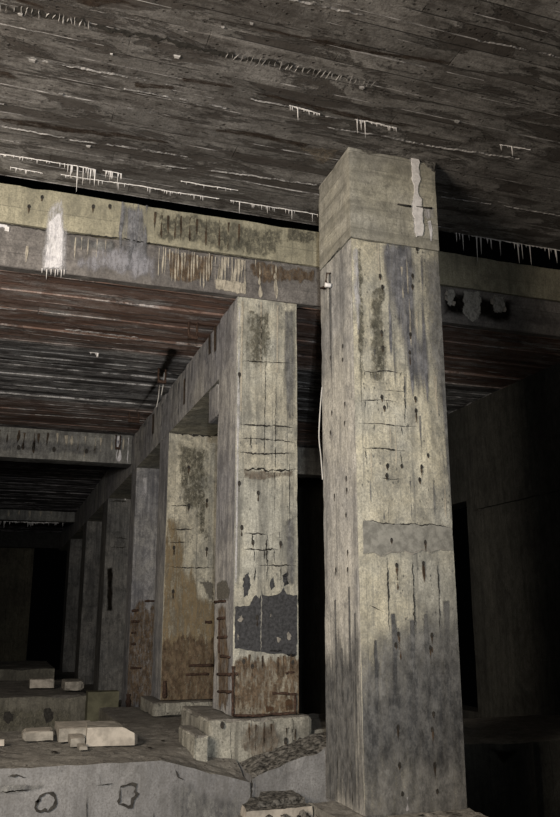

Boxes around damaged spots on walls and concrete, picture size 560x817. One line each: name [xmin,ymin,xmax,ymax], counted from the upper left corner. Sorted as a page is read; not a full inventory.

efflorescence [411,158,432,241]
water stain [41,202,317,584]
water stain [354,244,464,517]
water stain [480,298,510,320]
corrosion [127,519,299,717]
peeling [186,573,297,717]